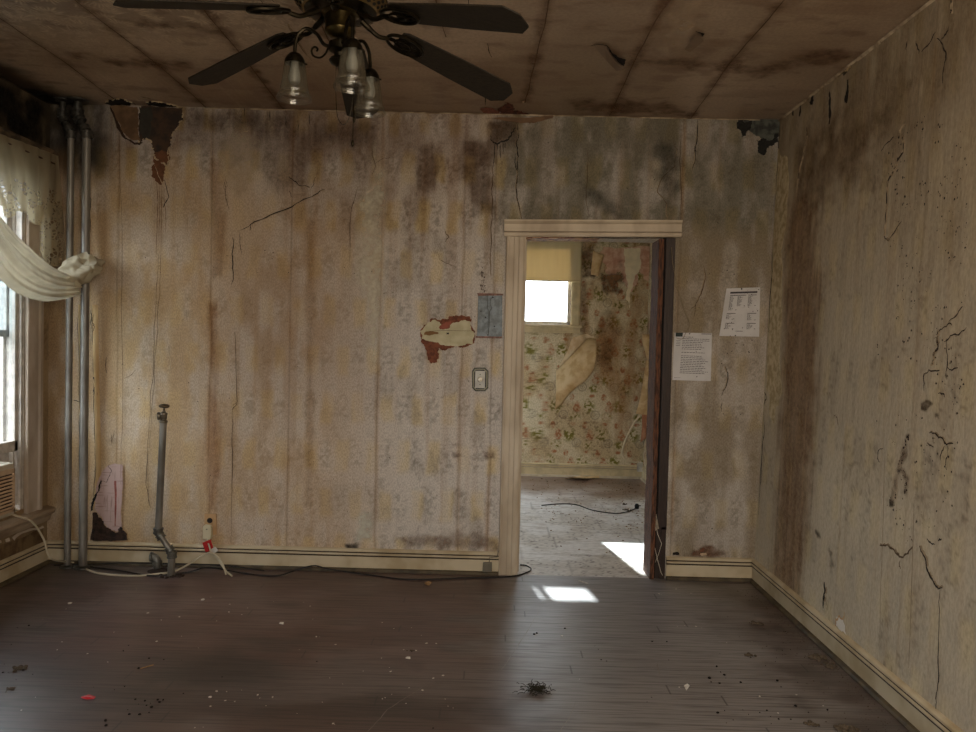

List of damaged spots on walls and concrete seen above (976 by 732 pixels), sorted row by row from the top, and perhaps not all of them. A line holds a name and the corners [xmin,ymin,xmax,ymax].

crack [906,0,953,83]
flaking render [105,99,183,165]
leakage [464,122,516,208]
crack [881,123,905,241]
flaking render [582,246,650,308]
peeling [420,315,475,364]
leakage [776,195,821,588]
crack [923,306,965,397]
crack [928,431,953,470]
flaking render [90,463,127,542]
crack [880,492,943,704]